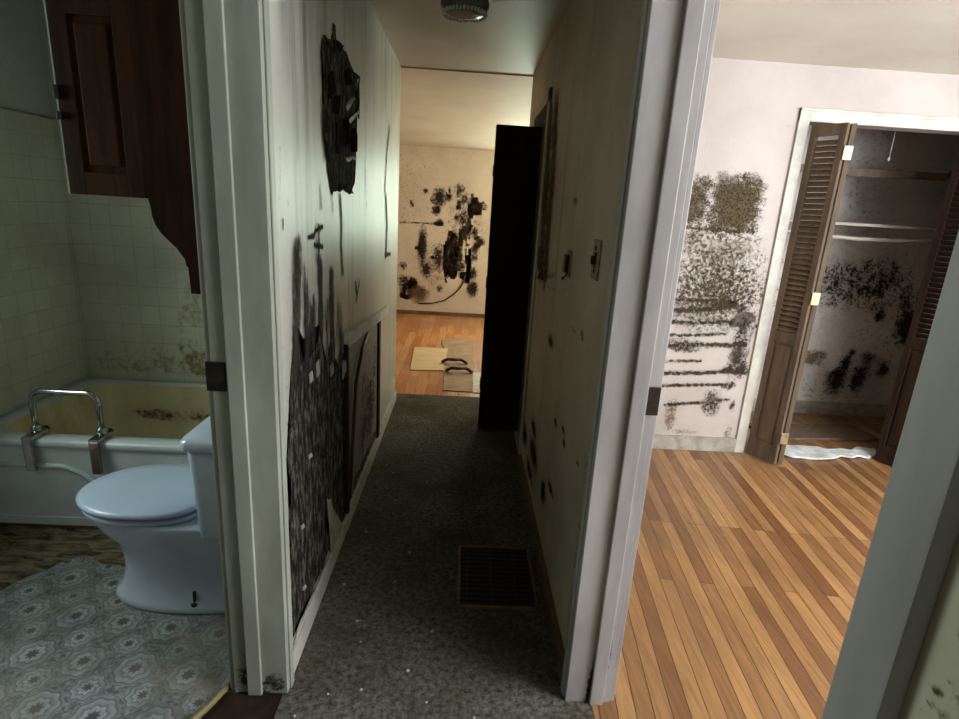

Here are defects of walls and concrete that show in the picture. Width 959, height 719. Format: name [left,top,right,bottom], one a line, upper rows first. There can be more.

damp [397,184,487,303]
damp [662,173,768,432]
damp [820,257,921,347]
damp [805,349,892,398]